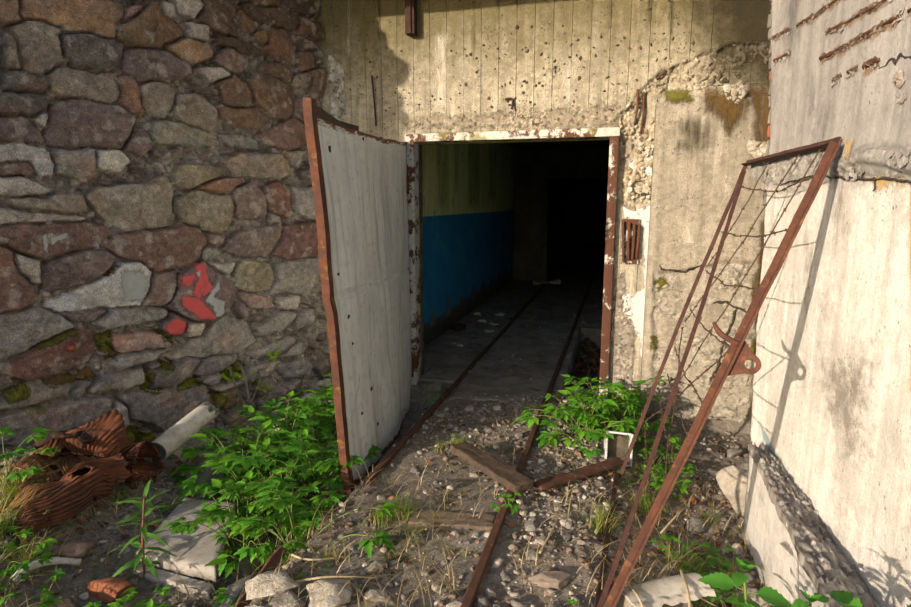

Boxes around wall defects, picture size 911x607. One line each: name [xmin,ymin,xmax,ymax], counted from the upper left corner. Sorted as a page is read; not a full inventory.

water stain [694,0,771,89]
spalling [819,0,911,63]
spalling [830,56,880,87]
crack [879,53,911,69]
crack [780,175,911,191]
spalling [395,0,841,423]
crack [659,264,702,273]